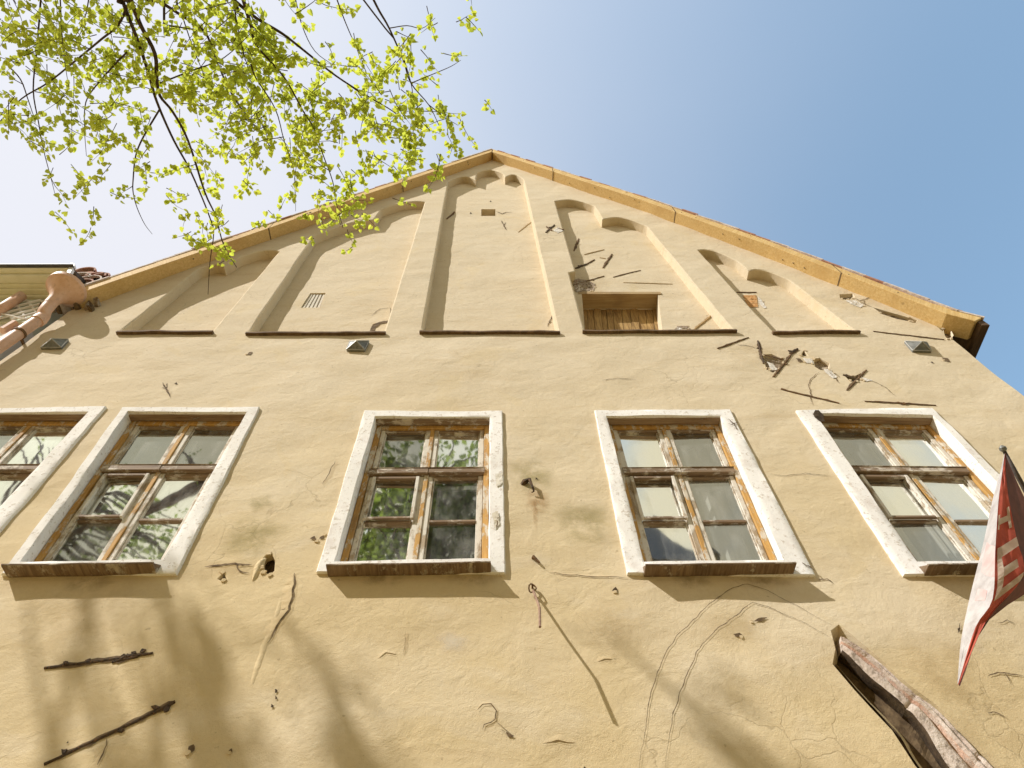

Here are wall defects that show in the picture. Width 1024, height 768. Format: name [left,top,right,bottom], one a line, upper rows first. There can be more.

spalling [762,354,784,372]
spalling [796,349,871,383]
spalling [260,551,275,577]
crack [263,573,298,644]
crack [639,584,826,768]